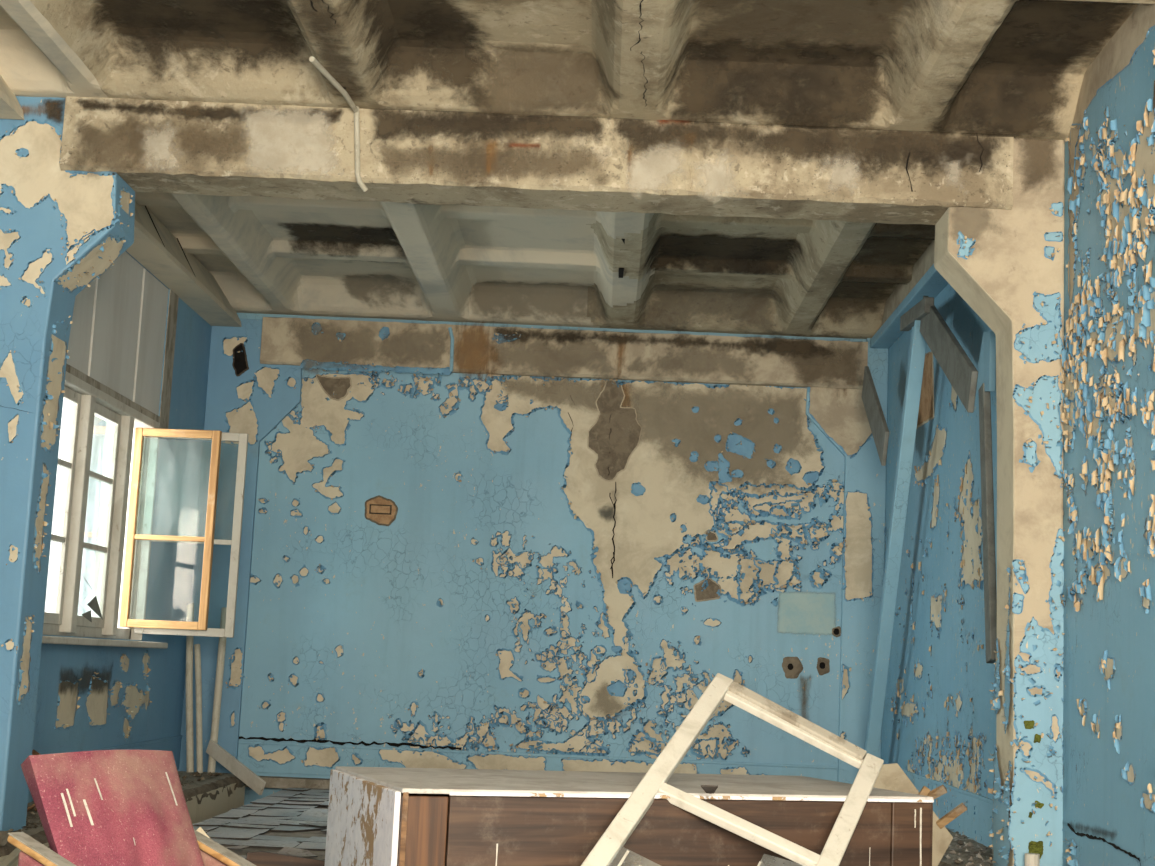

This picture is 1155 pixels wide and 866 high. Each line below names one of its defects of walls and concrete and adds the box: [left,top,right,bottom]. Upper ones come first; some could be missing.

peeling [0,349,25,444]
peeling [6,316,73,574]
peeling [0,119,133,308]
leakage [45,100,342,172]
leakage [284,224,410,301]
leakage [94,0,617,179]
leakage [473,223,935,485]
leakage [617,0,1134,189]
flaking render [888,3,1155,866]
peeling [222,336,890,775]
crack [239,736,461,750]
crack [1067,823,1141,866]